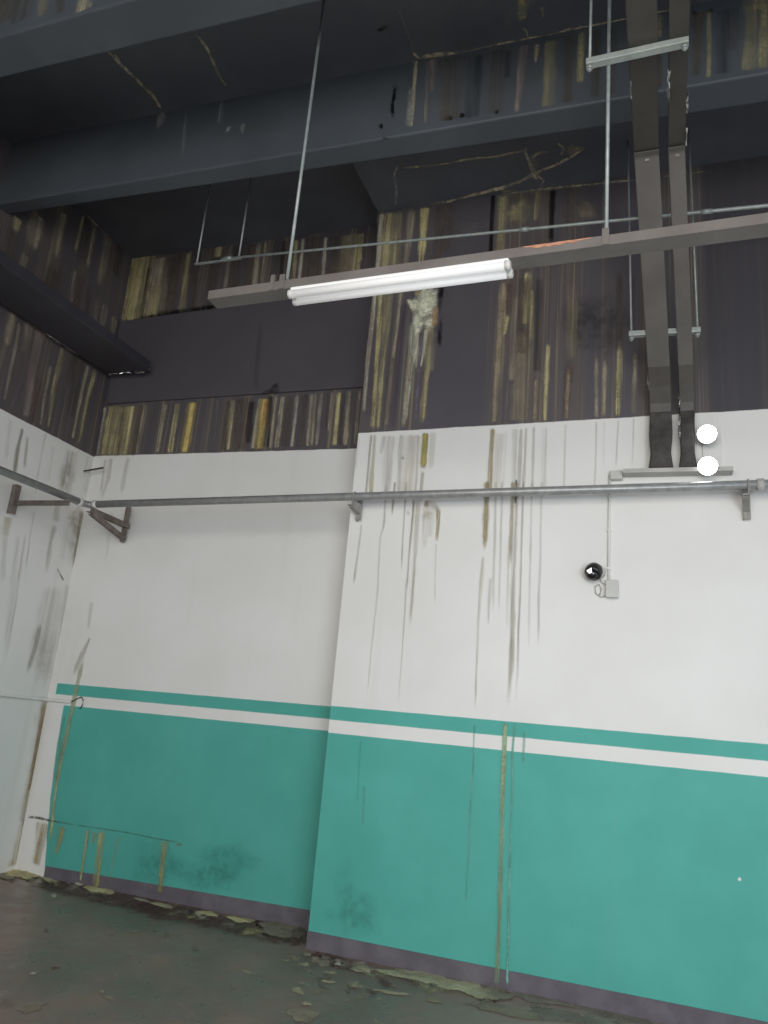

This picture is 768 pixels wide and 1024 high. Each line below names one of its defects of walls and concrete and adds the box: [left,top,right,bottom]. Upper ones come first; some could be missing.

crack [114,54,164,127]
crack [393,149,627,204]
damp [376,213,397,267]
damp [409,207,444,261]
damp [328,289,437,445]